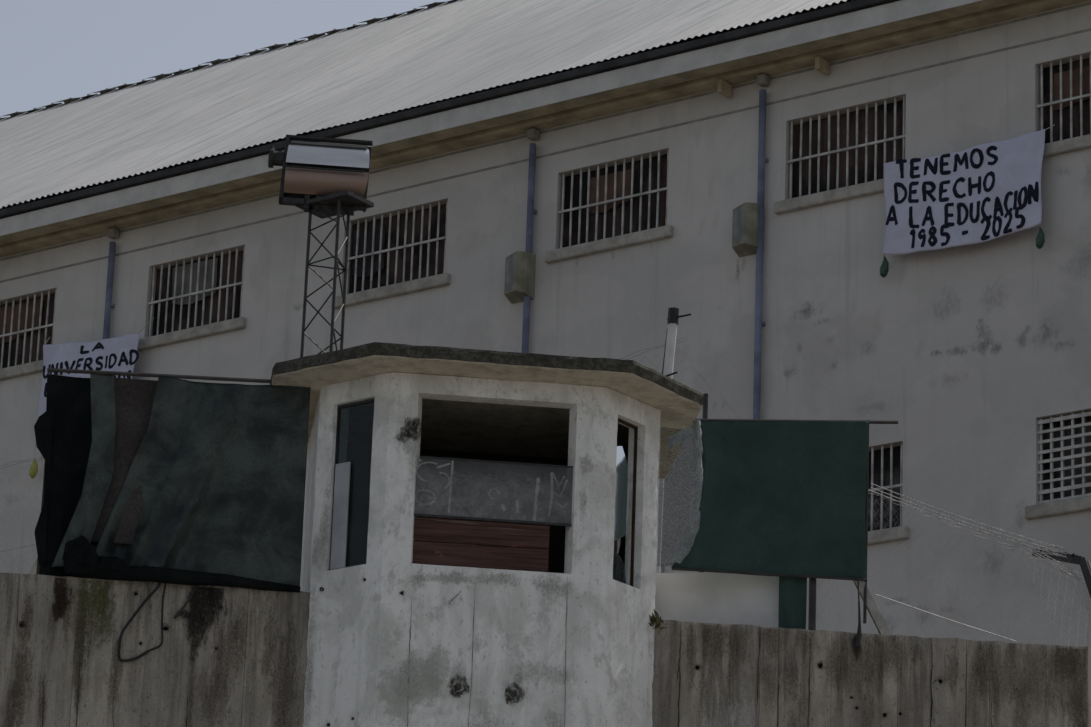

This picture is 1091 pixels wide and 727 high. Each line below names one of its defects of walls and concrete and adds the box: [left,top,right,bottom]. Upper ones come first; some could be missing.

leakage [179,587,210,661]
leakage [4,596,46,727]
spalling [449,675,469,698]
spalling [505,682,524,704]